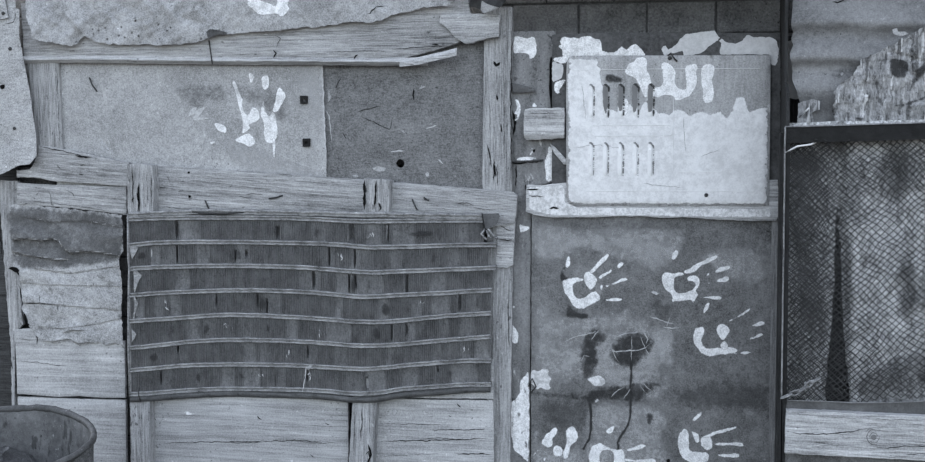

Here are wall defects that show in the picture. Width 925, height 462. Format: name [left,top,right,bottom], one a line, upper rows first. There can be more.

peeling [513,36,537,59]
peeling [517,31,799,217]
crack [166,438,333,446]